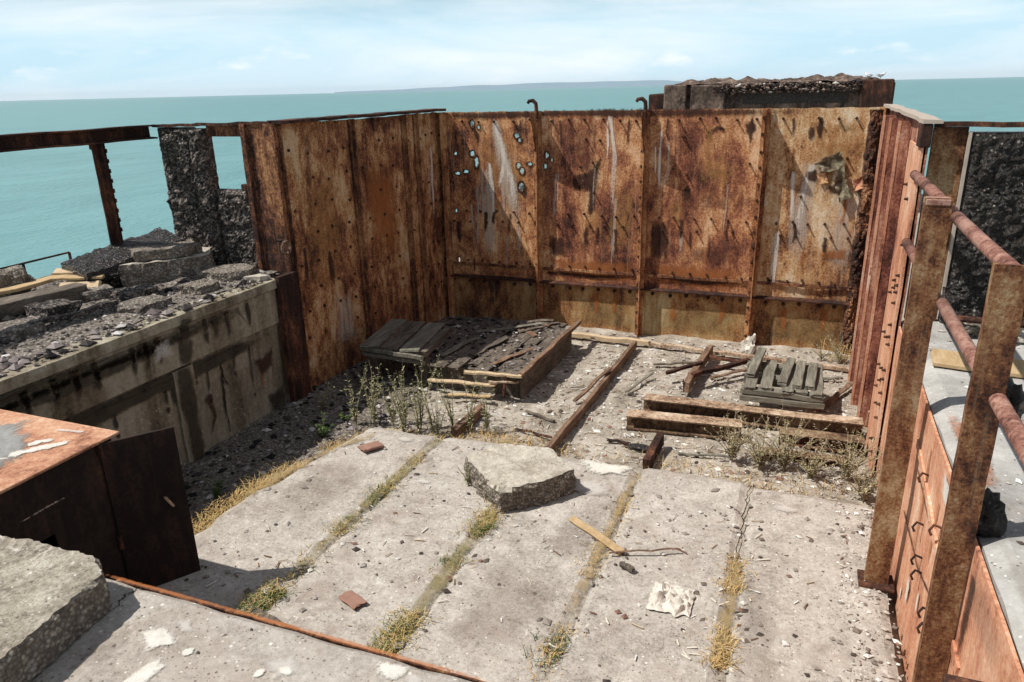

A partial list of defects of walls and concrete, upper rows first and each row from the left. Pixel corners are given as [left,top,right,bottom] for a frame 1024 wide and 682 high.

water stain [481,123,517,251]
water stain [607,116,617,198]
rust [451,108,795,288]
peeling [816,165,864,202]
rust [806,109,884,353]
water stain [0,311,254,461]
rust [254,350,273,386]
crack [734,485,751,565]
rust [904,452,939,592]
rust [115,578,478,679]
rust [958,576,975,646]